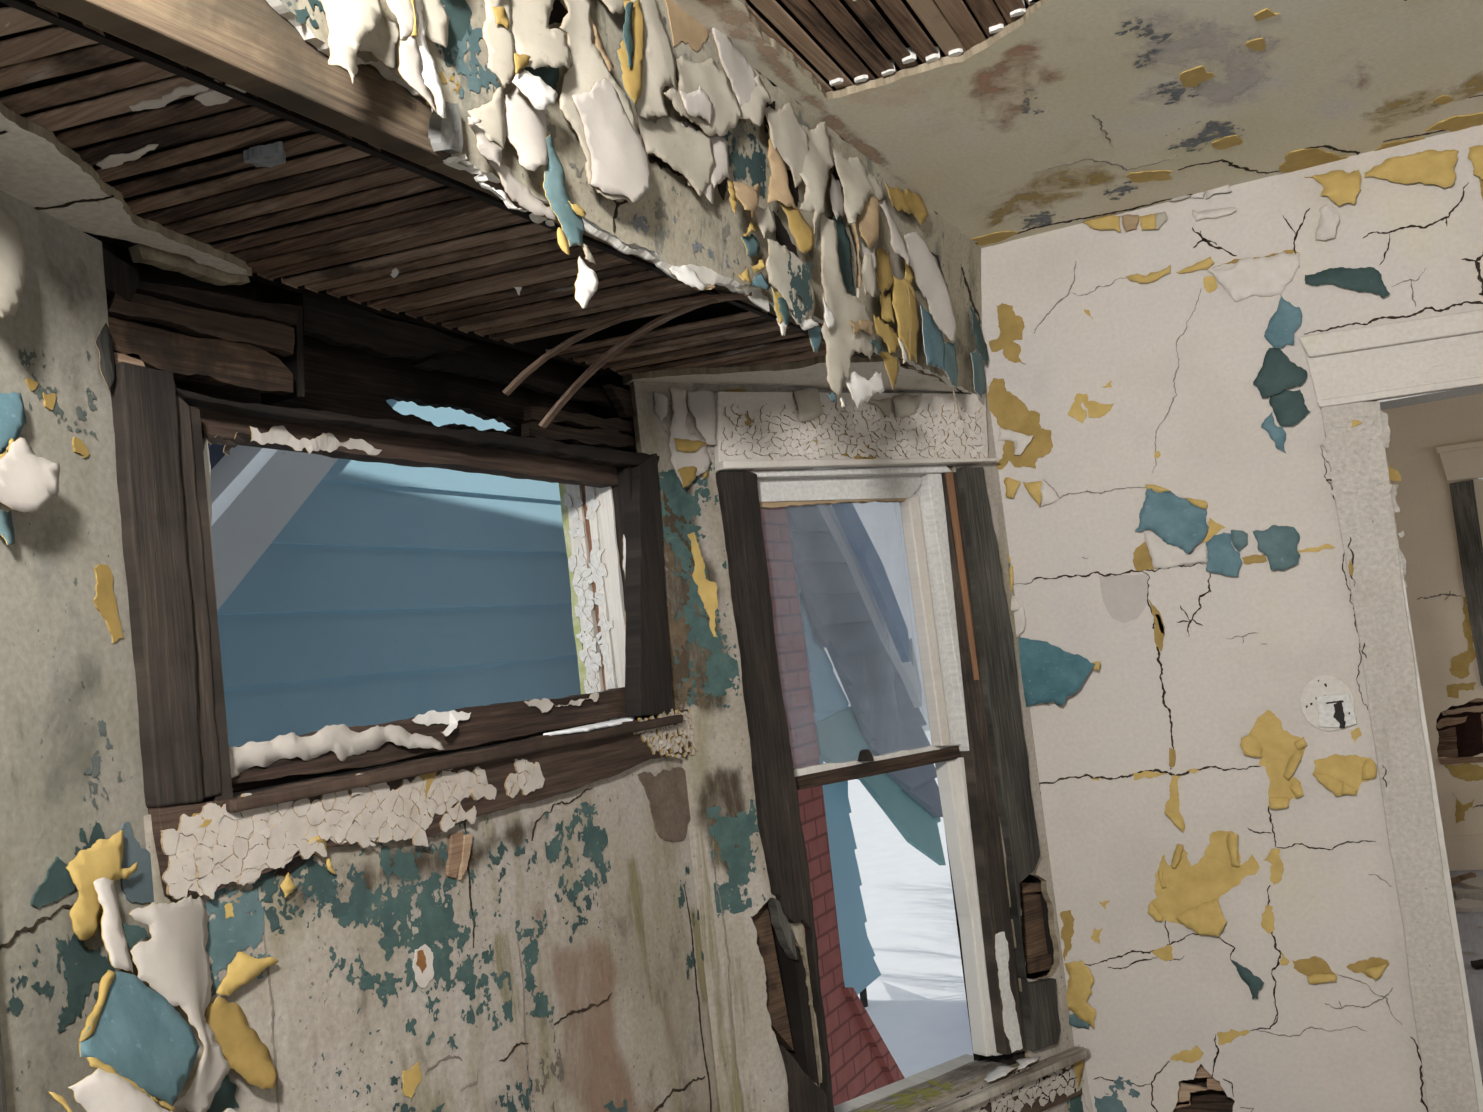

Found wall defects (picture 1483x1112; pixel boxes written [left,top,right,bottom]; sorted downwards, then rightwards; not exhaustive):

leakage [975,45,1036,95]
peeling [320,0,1060,507]
leakage [990,171,1113,225]
crack [1018,115,1446,256]
crack [1304,178,1483,335]
peeling [1126,249,1390,453]
peeling [0,378,60,545]
peeling [1133,484,1336,577]
crack [1014,557,1265,793]
peeling [30,822,279,1112]
crack [1085,920,1235,969]
crack [1211,885,1428,1112]